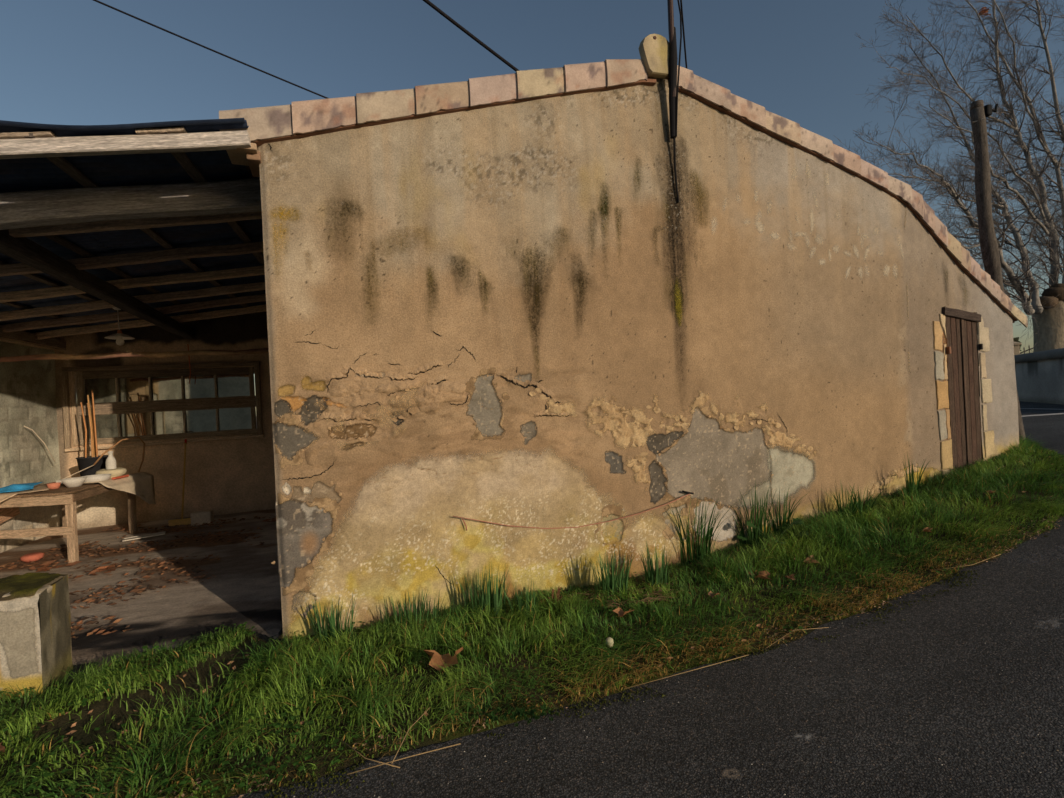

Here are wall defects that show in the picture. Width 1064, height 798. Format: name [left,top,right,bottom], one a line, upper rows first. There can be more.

water stain [600,191,619,233]
water stain [665,122,706,359]
water stain [524,257,545,349]
water stain [573,270,588,308]
spalling [272,376,418,469]
crack [295,330,475,422]
spalling [463,368,509,440]
crack [497,370,576,418]
spalling [514,373,817,542]
spalling [271,481,342,620]
water stain [285,448,697,639]
spalling [595,504,628,549]